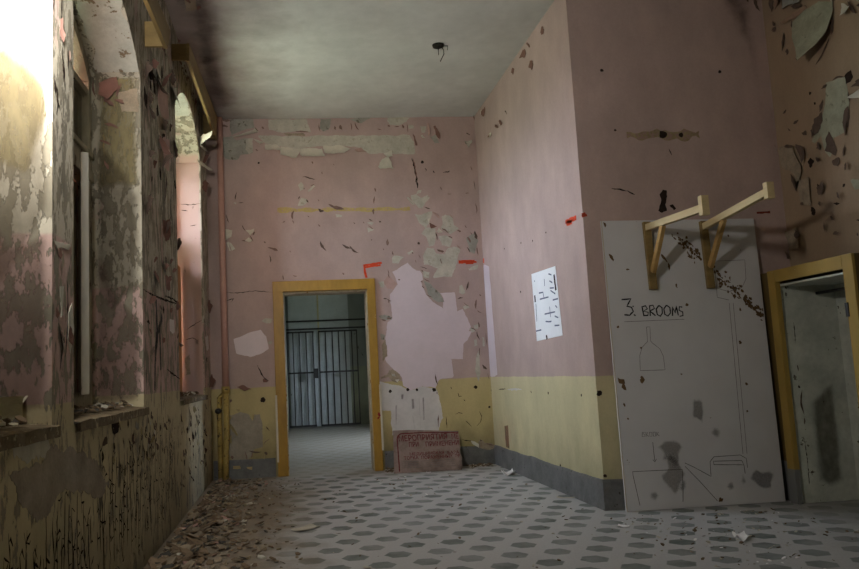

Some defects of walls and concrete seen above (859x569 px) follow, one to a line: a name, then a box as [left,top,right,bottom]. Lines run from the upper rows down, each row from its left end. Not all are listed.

leakage [0,0,46,169]
leakage [100,78,135,185]
peeling [223,117,440,169]
peeling [747,0,859,64]
peeling [777,70,859,215]
peeling [378,190,478,303]
peeling [102,403,207,487]
flaking render [380,369,443,435]